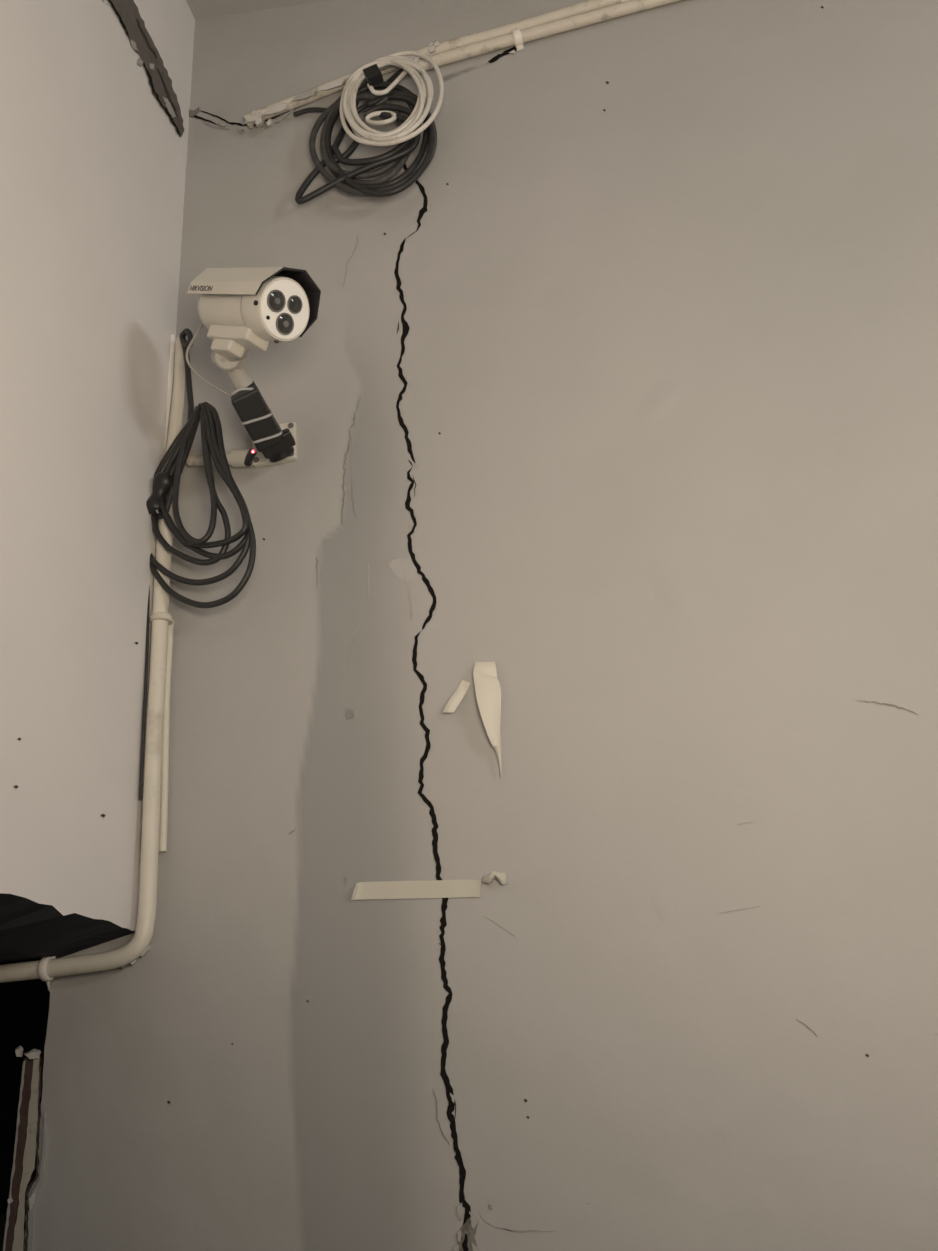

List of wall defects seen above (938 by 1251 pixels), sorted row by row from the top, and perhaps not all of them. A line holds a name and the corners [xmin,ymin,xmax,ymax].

crack [341,395,361,525]
crack [394,159,556,1232]
spalling [453,1203,491,1251]